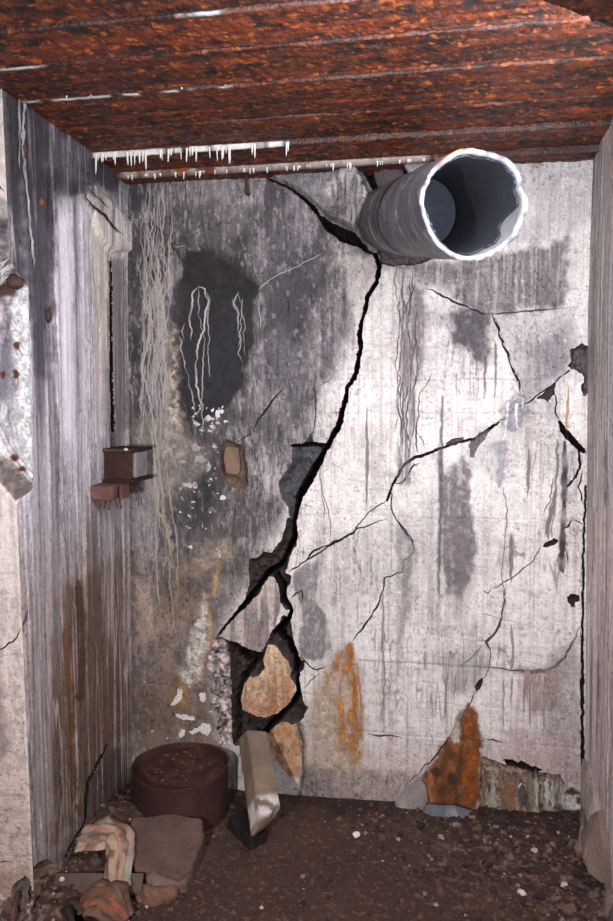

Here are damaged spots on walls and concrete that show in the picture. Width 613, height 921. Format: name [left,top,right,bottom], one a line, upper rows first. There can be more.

damp [18,100,36,265]
damp [0,259,9,285]
damp [0,285,63,533]
damp [93,141,425,634]
crack [236,387,285,442]
crack [260,179,587,783]
crack [0,606,29,657]
spalling [167,433,330,787]
corrosion [305,643,363,772]
corrosion [422,703,482,808]
spalling [478,756,568,812]